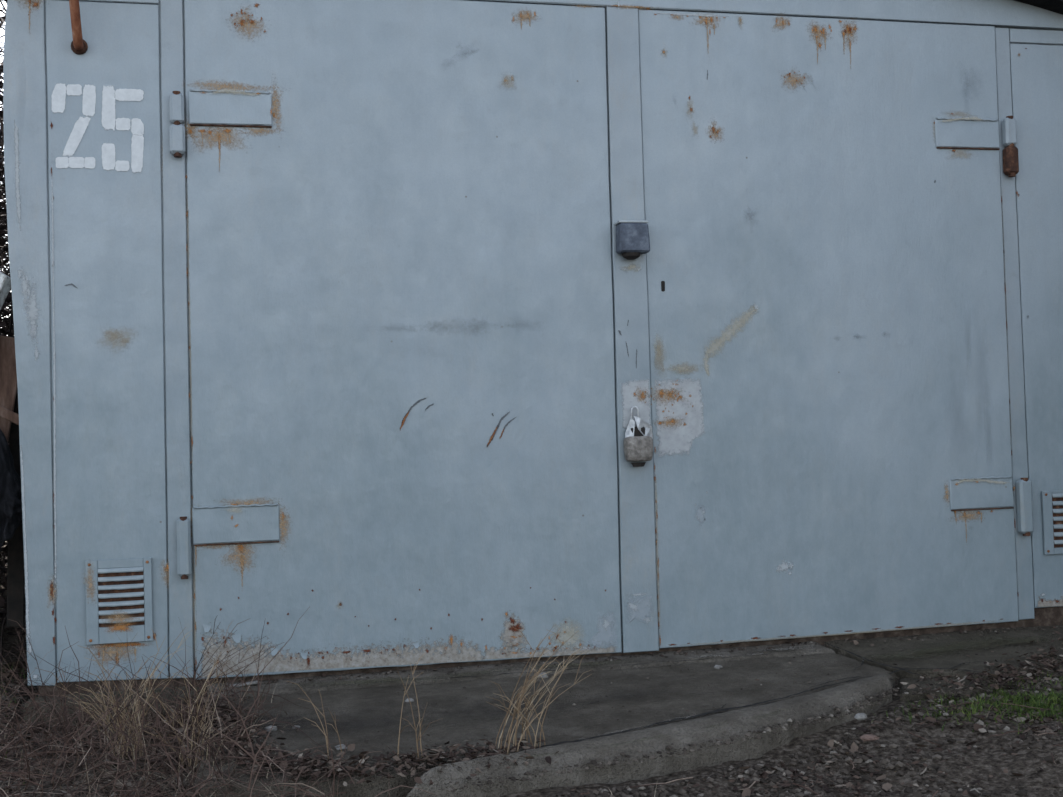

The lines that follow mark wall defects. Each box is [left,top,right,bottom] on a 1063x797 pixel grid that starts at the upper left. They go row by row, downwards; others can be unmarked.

rust [231,3,266,34]
rust [812,20,856,65]
rust [249,91,280,134]
rust [186,122,234,170]
rust [98,614,156,663]
peeling [199,624,616,677]